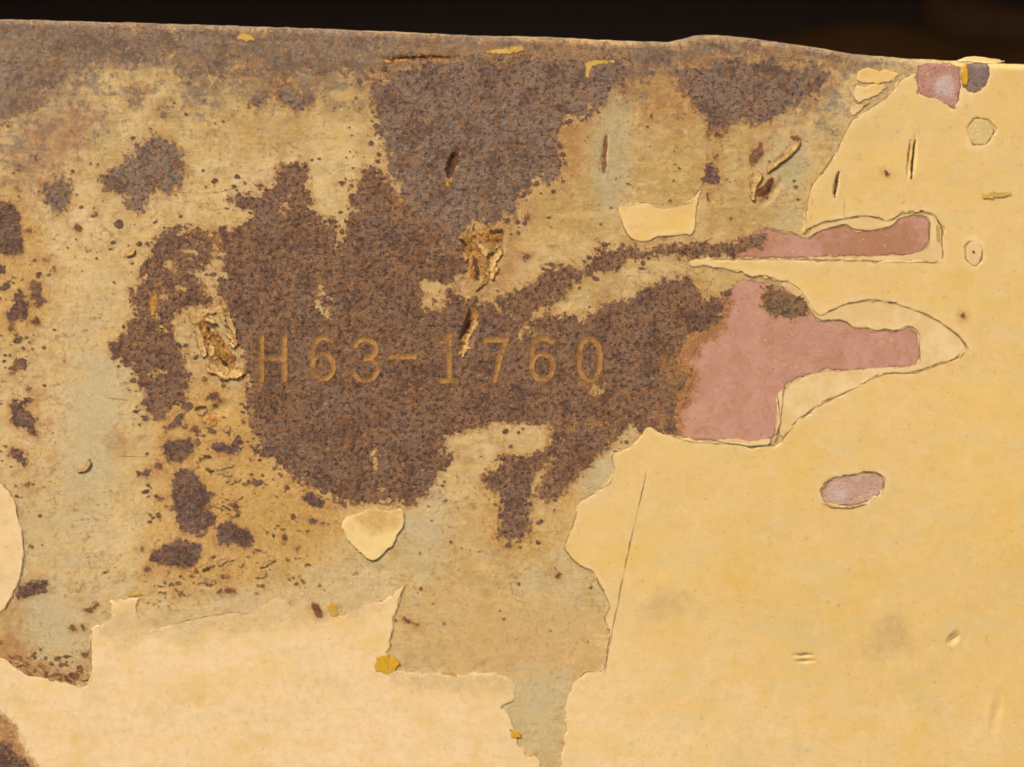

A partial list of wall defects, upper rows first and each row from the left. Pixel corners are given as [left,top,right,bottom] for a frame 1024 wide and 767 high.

peeling [841,56,1004,141]
peeling [618,154,708,243]
peeling [730,212,943,263]
corrosion [0,20,856,572]
peeling [651,274,968,447]
peeling [821,471,885,508]
peeling [341,509,404,560]
corrosion [216,574,236,597]
peeling [7,654,90,685]